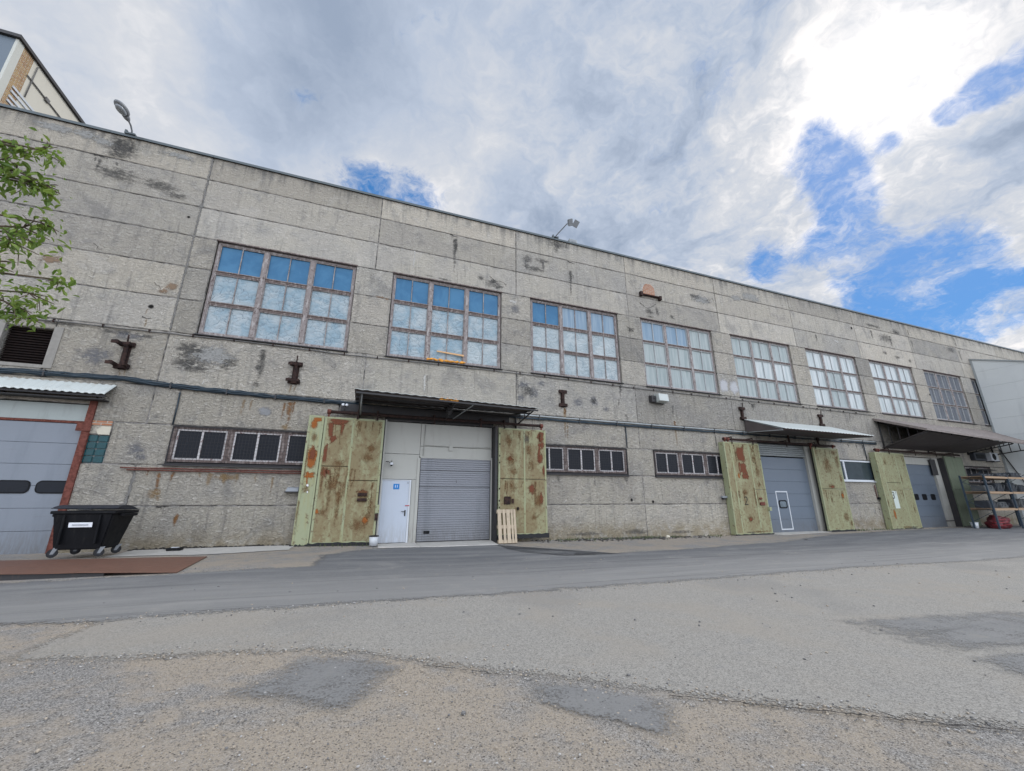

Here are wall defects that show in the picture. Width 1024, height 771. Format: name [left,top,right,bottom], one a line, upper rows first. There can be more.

water stain [176,344,237,384]
rust [304,418,380,530]
rust [505,431,545,519]
rust [729,445,760,505]